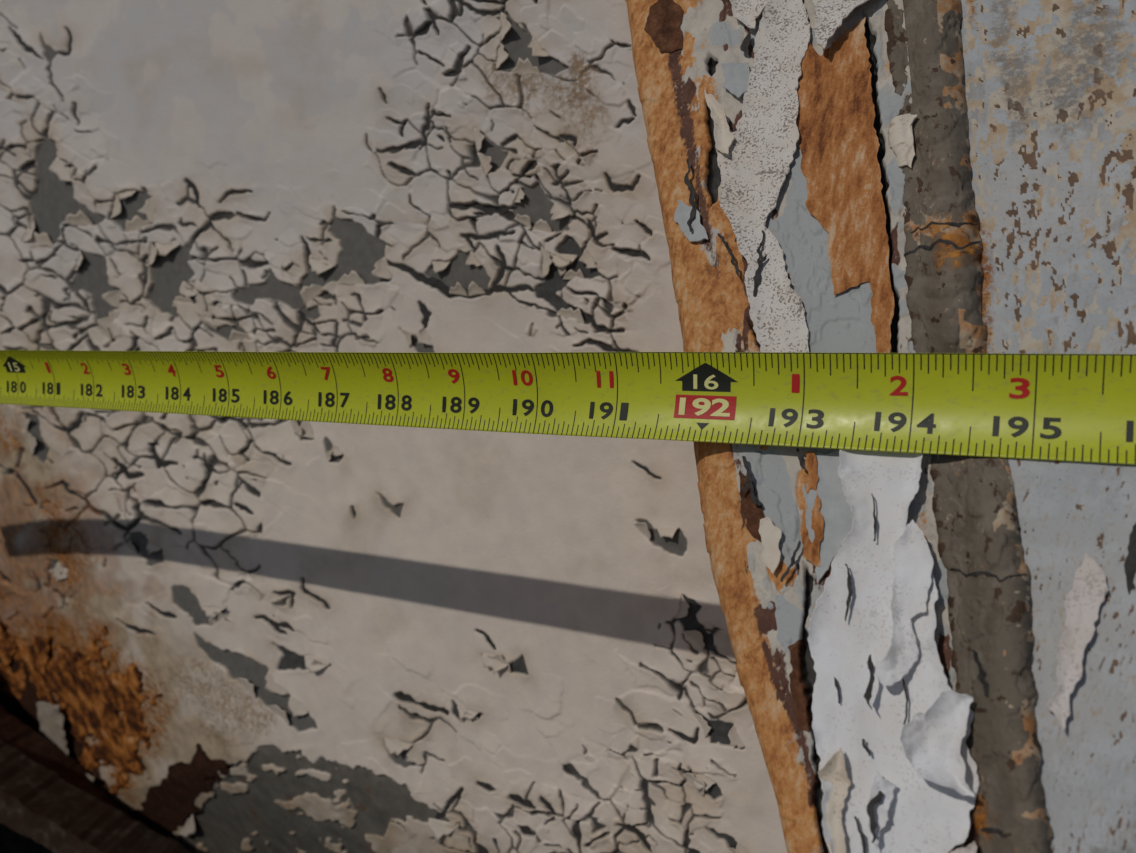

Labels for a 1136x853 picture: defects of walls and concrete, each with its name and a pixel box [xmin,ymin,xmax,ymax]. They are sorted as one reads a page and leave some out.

crack [381,90,451,177]
crack [388,202,535,329]
peeling [674,199,709,242]
peeling [704,0,918,353]
corrosion [930,214,992,329]
crack [576,313,635,352]
crack [113,449,218,480]
peeling [739,471,782,574]
peeling [788,449,979,853]
corrosion [0,616,174,809]
peeling [133,743,477,853]
crack [435,781,557,835]